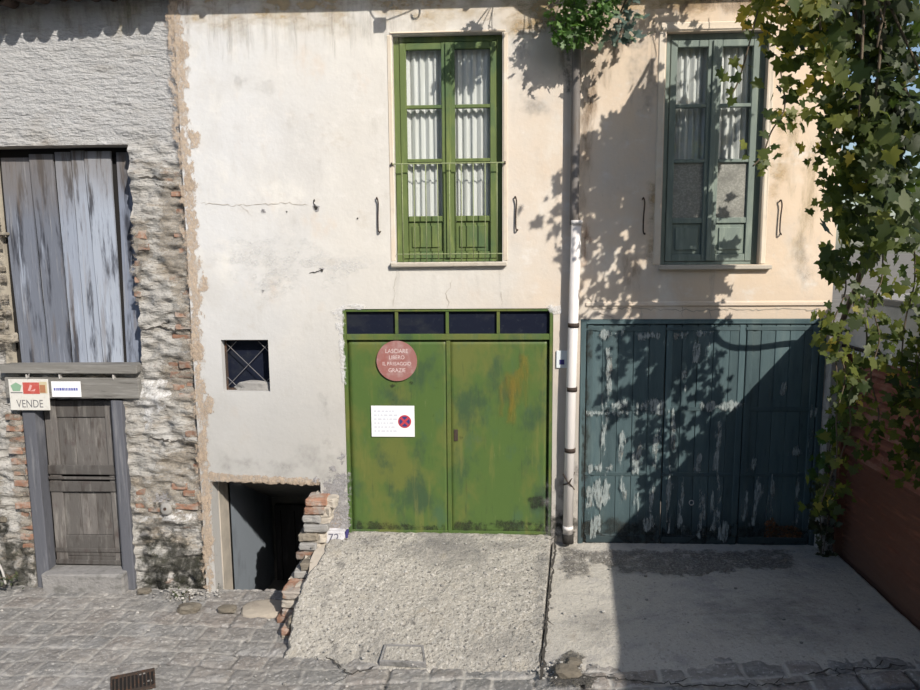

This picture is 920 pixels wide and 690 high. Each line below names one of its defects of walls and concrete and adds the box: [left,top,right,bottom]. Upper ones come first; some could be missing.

damp [256,0,337,18]
crack [138,175,181,198]
crack [141,321,187,332]
spalling [131,0,351,639]
peeling [674,330,713,391]
crack [151,437,197,454]
peeling [586,329,676,539]
spalling [559,400,794,576]
peeling [741,459,812,538]
damp [136,526,206,590]